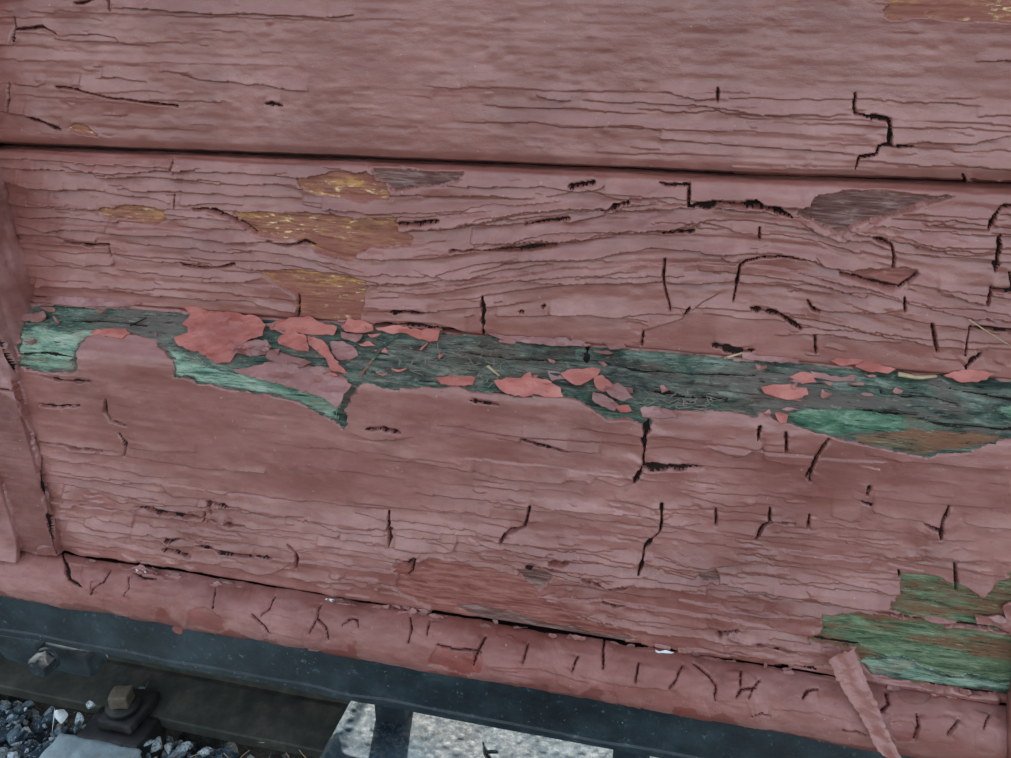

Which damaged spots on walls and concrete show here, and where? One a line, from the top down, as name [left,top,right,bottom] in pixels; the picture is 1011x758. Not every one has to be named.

peeling [867,0,1011,29]
crack [852,93,912,170]
peeling [17,163,1011,459]
crack [660,182,817,352]
crack [848,236,916,310]
crack [986,204,1011,302]
crack [623,342,755,400]
crack [852,325,1011,431]
peeling [0,380,59,555]
crack [633,418,702,483]
crack [589,502,663,606]
peeling [804,572,1011,758]